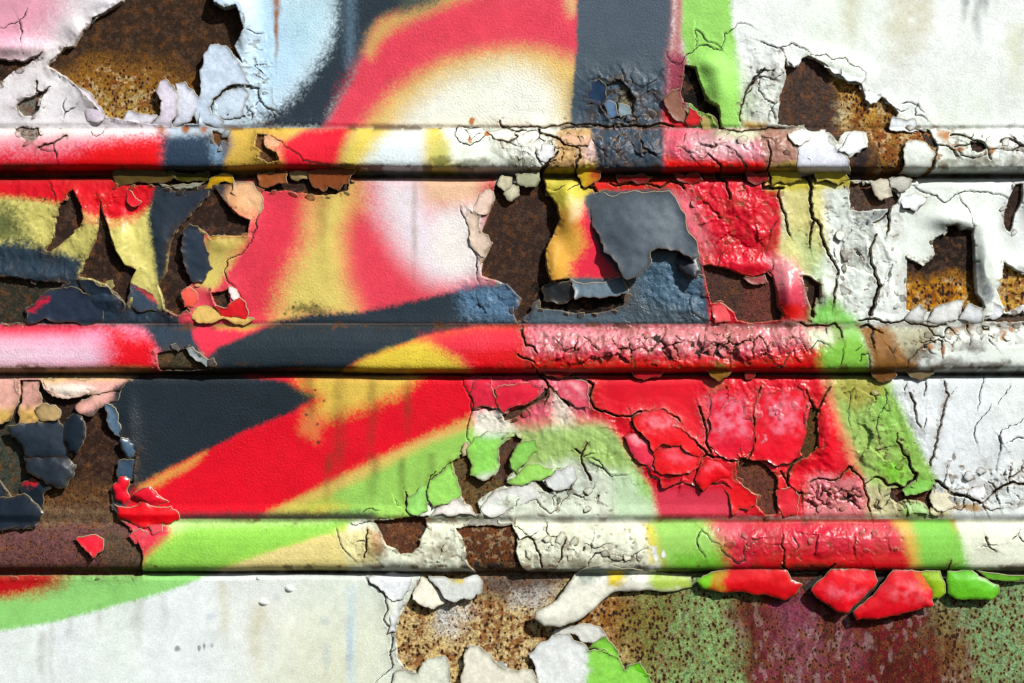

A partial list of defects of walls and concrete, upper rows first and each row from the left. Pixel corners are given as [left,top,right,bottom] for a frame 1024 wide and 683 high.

peeling [0,57,39,89]
peeling [14,95,46,146]
peeling [50,0,250,152]
peeling [0,131,356,327]
peeling [460,131,783,330]
peeling [663,65,730,135]
crack [454,23,1024,615]
peeling [746,54,943,216]
peeling [899,225,1024,335]
peeling [999,184,1023,237]
peeling [0,374,180,582]
peeling [367,370,1024,683]